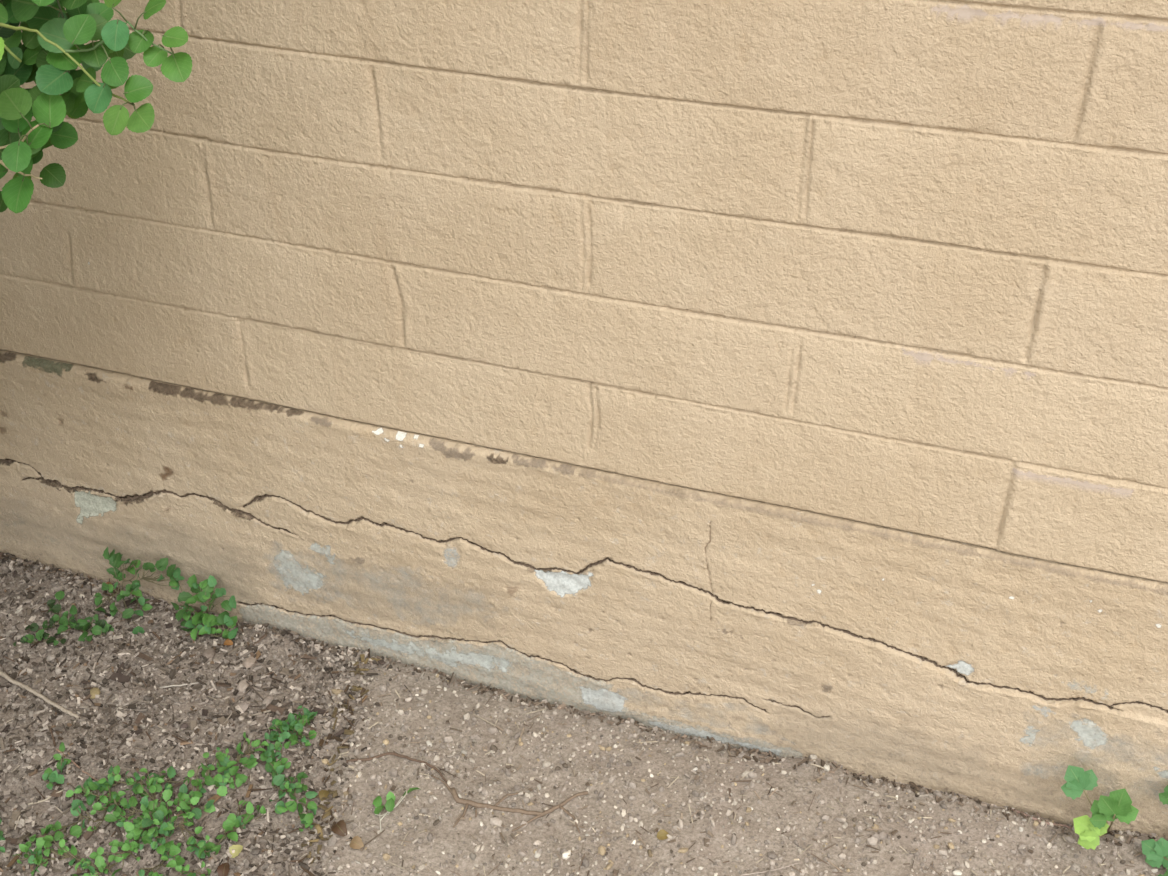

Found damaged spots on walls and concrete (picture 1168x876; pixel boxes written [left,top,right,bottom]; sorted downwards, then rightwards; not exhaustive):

peeling [372,427,424,448]
spalling [74,491,117,524]
spalling [534,569,593,597]
crack [0,459,1168,718]